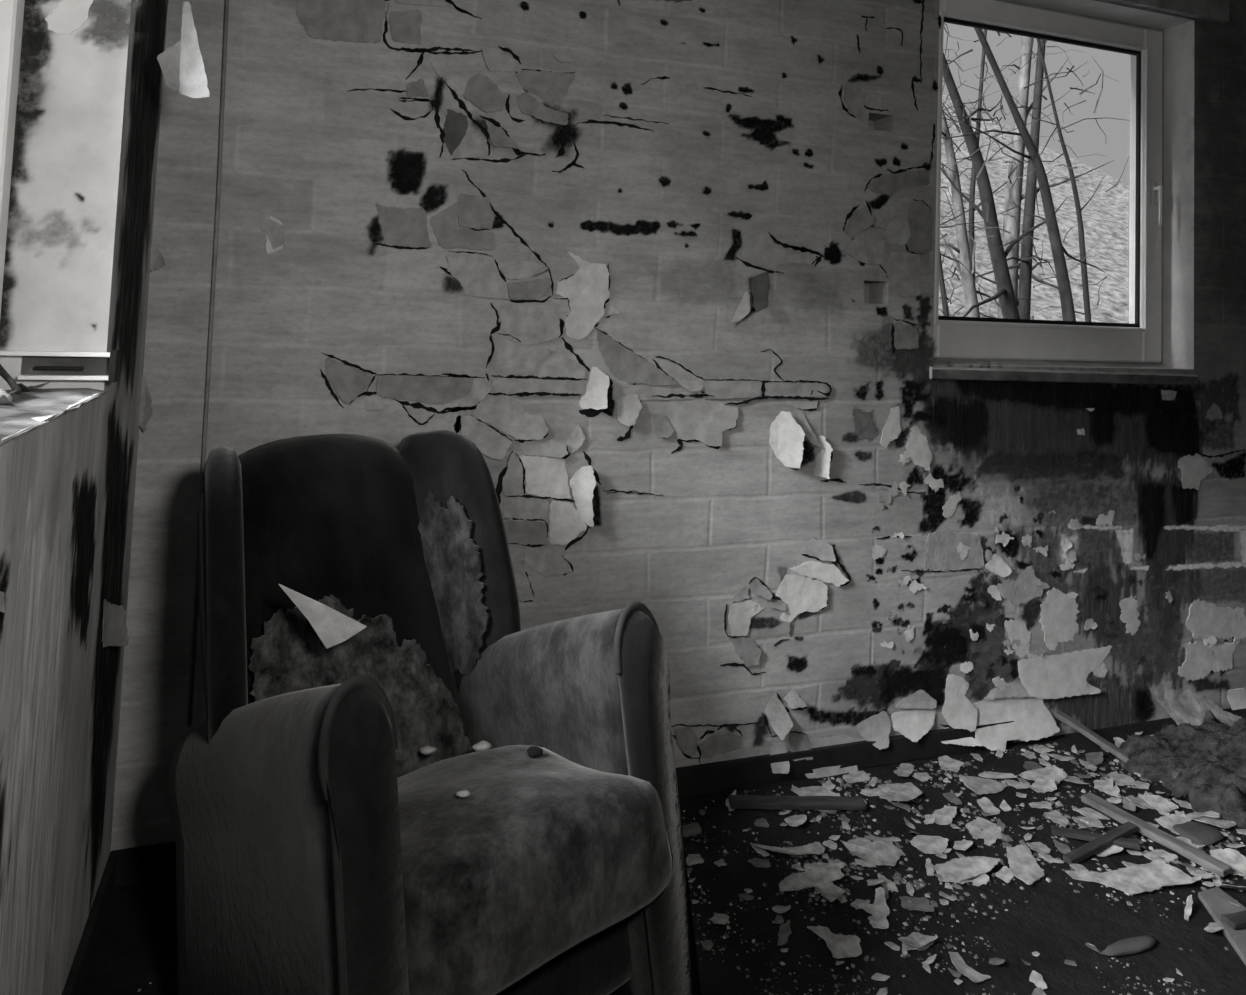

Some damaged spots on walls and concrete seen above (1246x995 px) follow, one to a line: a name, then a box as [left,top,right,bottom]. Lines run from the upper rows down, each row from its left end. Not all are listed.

water stain [0,0,51,349]
water stain [68,401,133,908]
water stain [83,0,168,390]
peeling [296,0,580,173]
crack [462,170,549,268]
peeling [320,150,738,603]
crack [575,115,669,132]
crack [761,349,784,381]
peeling [671,400,1115,796]
crack [857,0,942,163]
water stain [832,324,1246,733]
peeling [1135,599,1246,726]